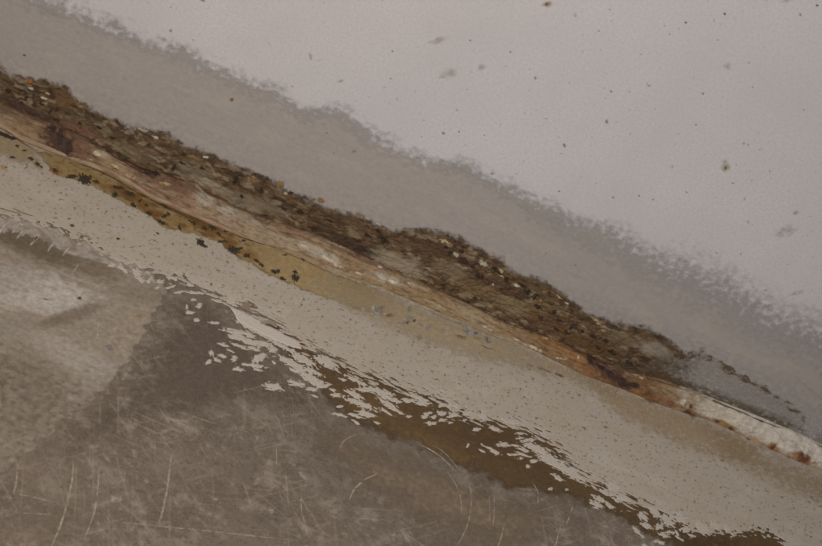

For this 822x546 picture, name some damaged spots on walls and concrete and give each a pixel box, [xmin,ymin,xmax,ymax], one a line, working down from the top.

peeling [298,243,343,268]
leakage [129,313,296,414]
peeling [108,262,732,546]
leakage [266,324,794,546]
rust [788,452,815,465]